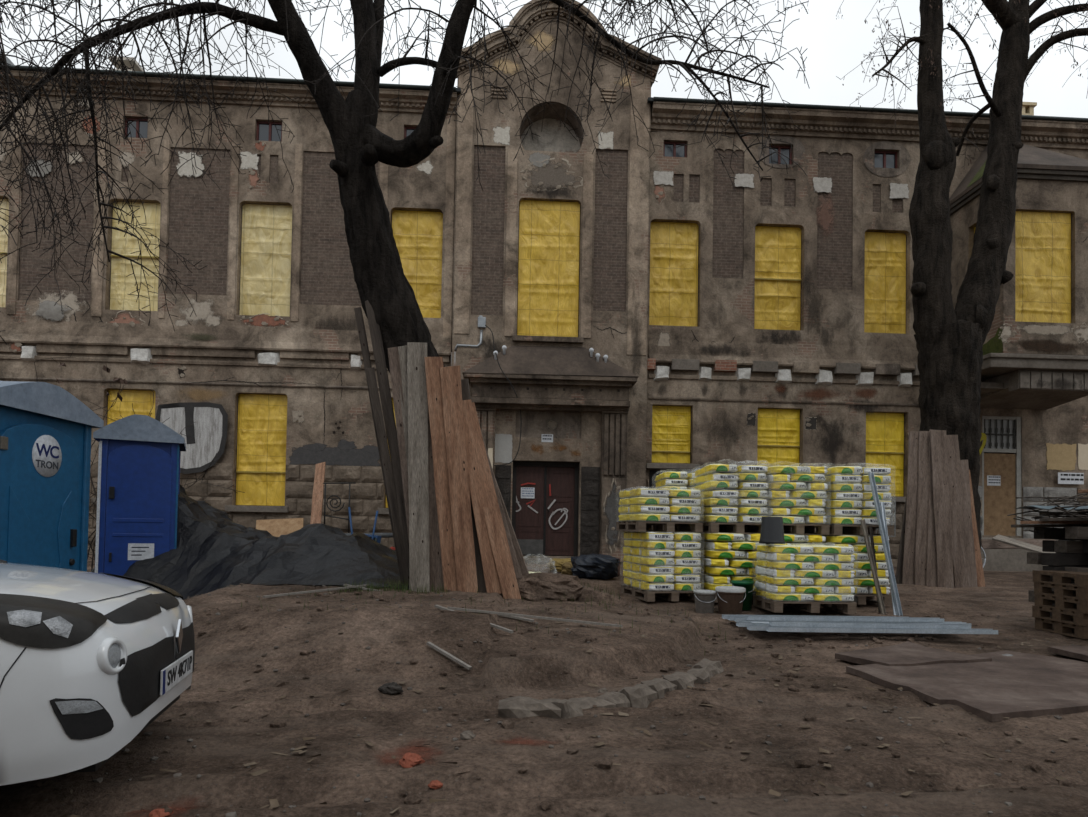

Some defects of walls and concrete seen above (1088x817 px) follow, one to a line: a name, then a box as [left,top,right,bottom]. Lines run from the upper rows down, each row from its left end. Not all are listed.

peeling [26,290,86,321]
peeling [175,298,220,326]